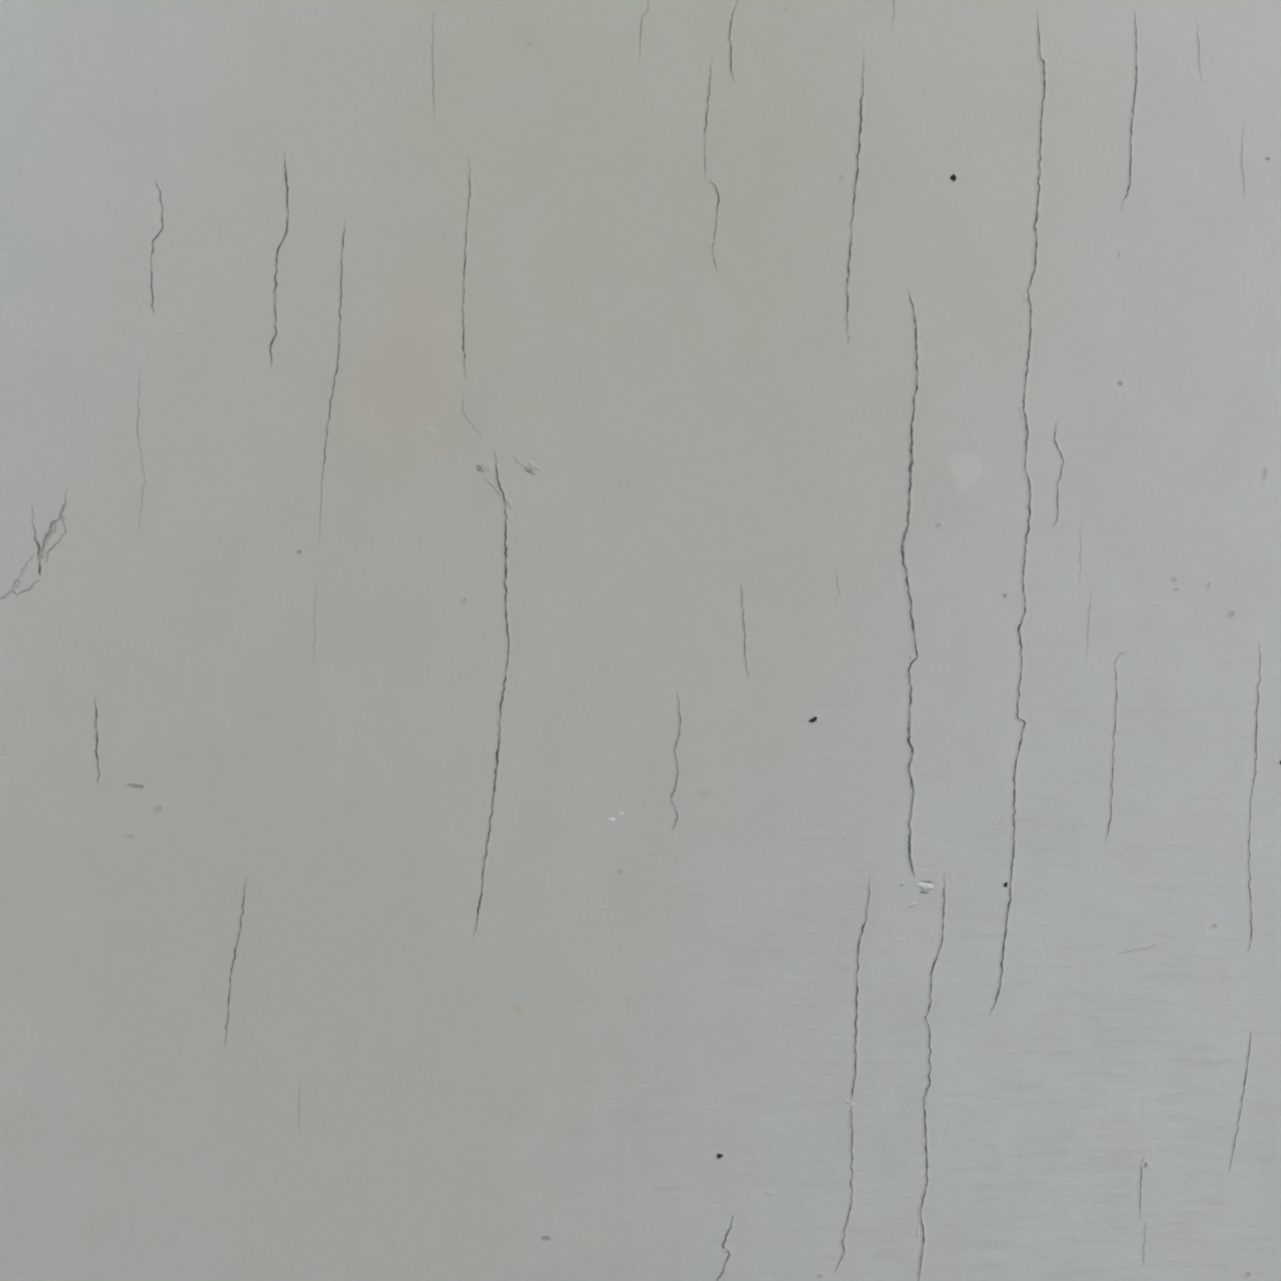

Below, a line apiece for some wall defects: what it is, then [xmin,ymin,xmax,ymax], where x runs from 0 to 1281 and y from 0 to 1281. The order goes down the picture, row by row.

crack [148,178,166,315]
crack [267,152,292,368]
crack [702,0,740,273]
crack [843,48,866,344]
crack [1119,10,1140,212]
crack [460,156,528,939]
crack [988,12,1127,1018]
crack [897,288,948,1281]
crack [1246,640,1263,953]
crack [223,874,248,1052]
crack [833,874,872,1274]
crack [1228,1030,1252,1172]